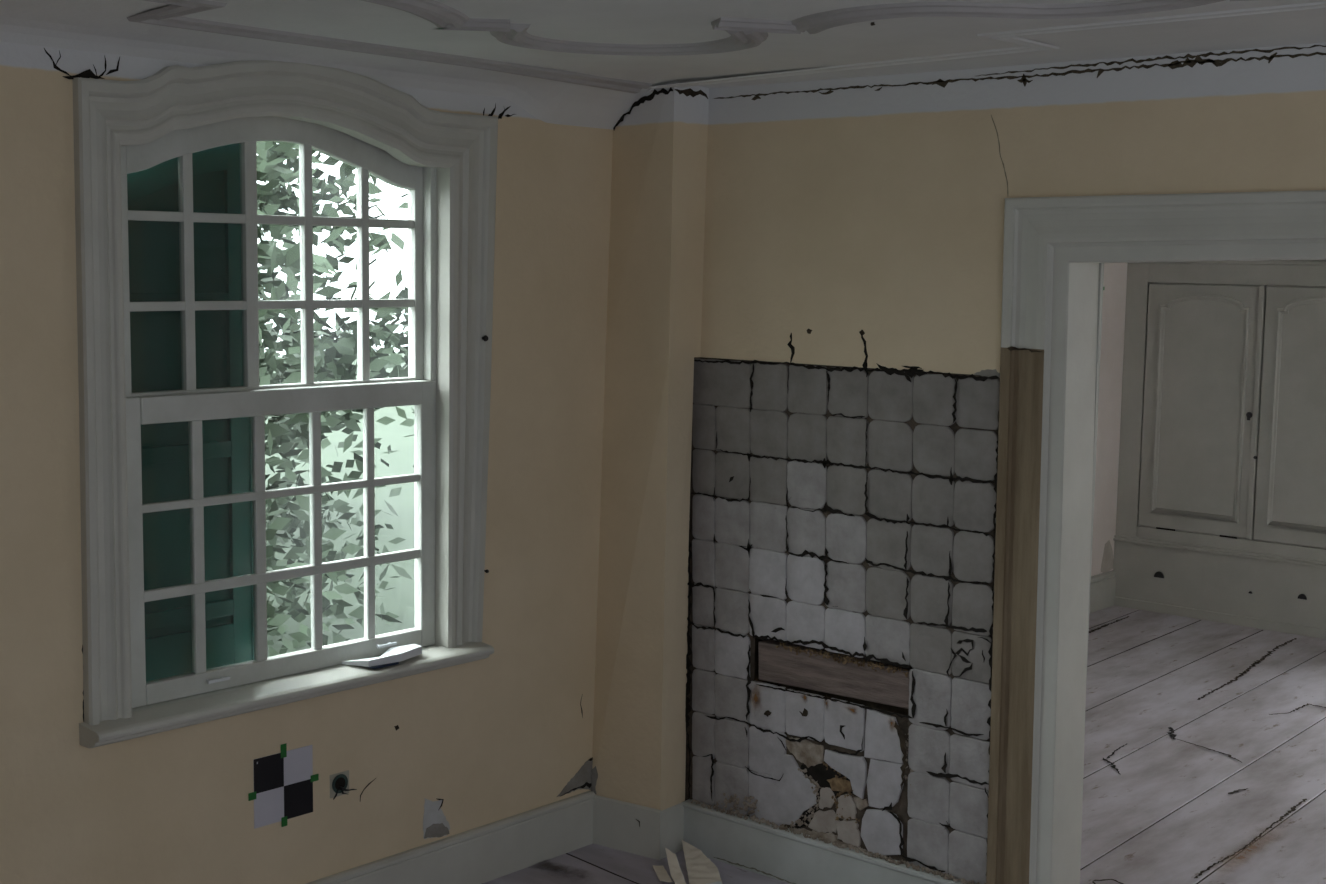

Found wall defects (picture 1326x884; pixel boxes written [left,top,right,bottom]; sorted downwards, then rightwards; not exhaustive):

crack [44,48,120,79]
crack [613,45,1326,130]
crack [685,333,1000,872]
crack [1089,616,1129,633]
crack [1197,638,1296,700]
crack [1269,703,1326,715]
peeling [423,798,450,839]
spalling [557,757,598,797]
spalling [785,737,869,849]
crack [1103,744,1127,774]
crack [1167,727,1248,794]
crack [1194,799,1307,878]